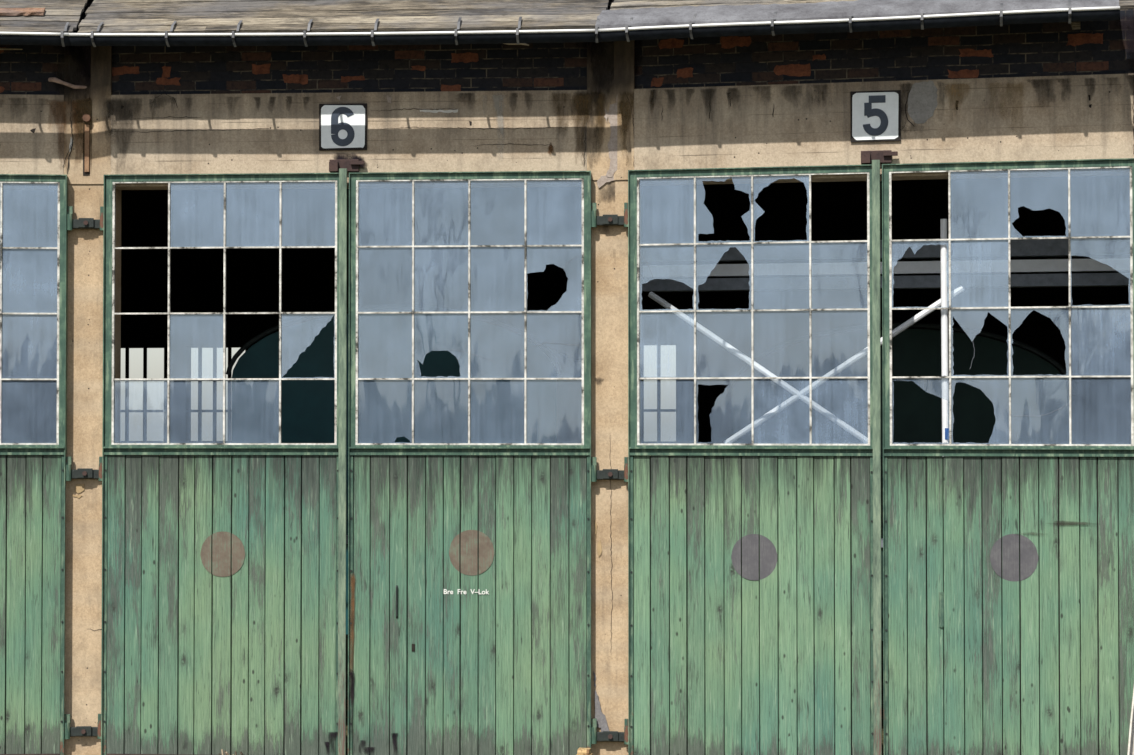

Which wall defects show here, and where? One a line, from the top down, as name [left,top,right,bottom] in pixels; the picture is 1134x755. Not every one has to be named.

leakage [106,99,138,151]
leakage [554,41,614,149]
leakage [619,93,633,133]
leakage [901,83,911,118]